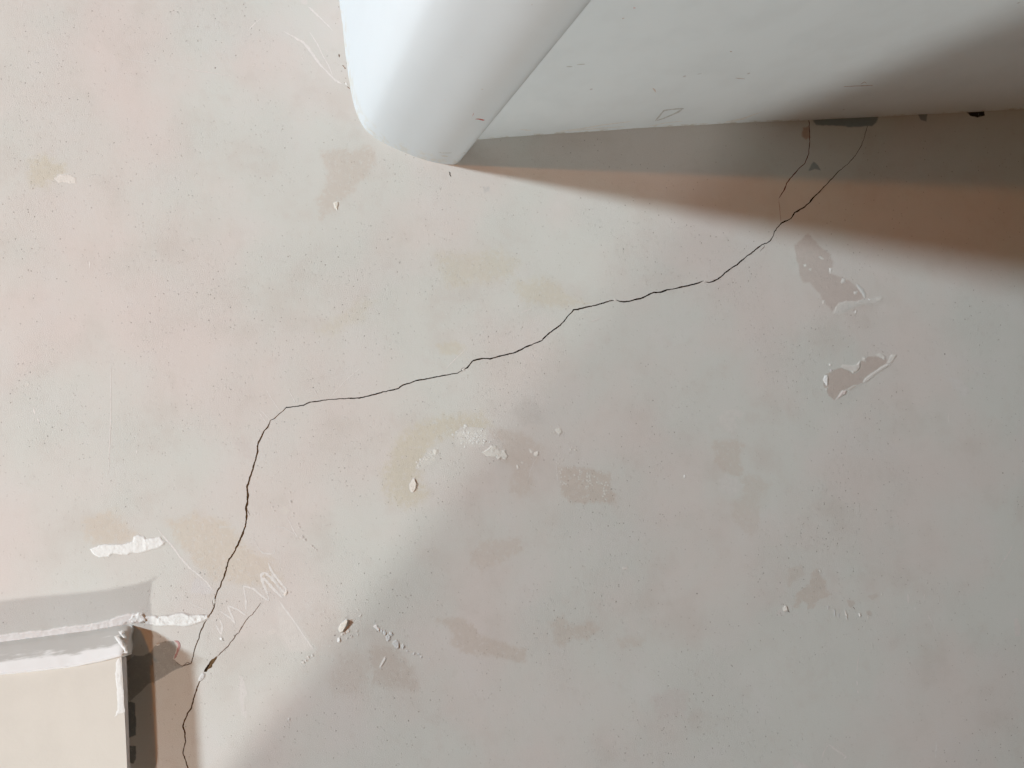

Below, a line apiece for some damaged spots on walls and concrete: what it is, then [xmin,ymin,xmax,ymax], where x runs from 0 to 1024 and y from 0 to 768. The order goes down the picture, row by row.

peeling [791,231,884,316]
peeling [821,352,897,403]
crack [179,122,868,768]